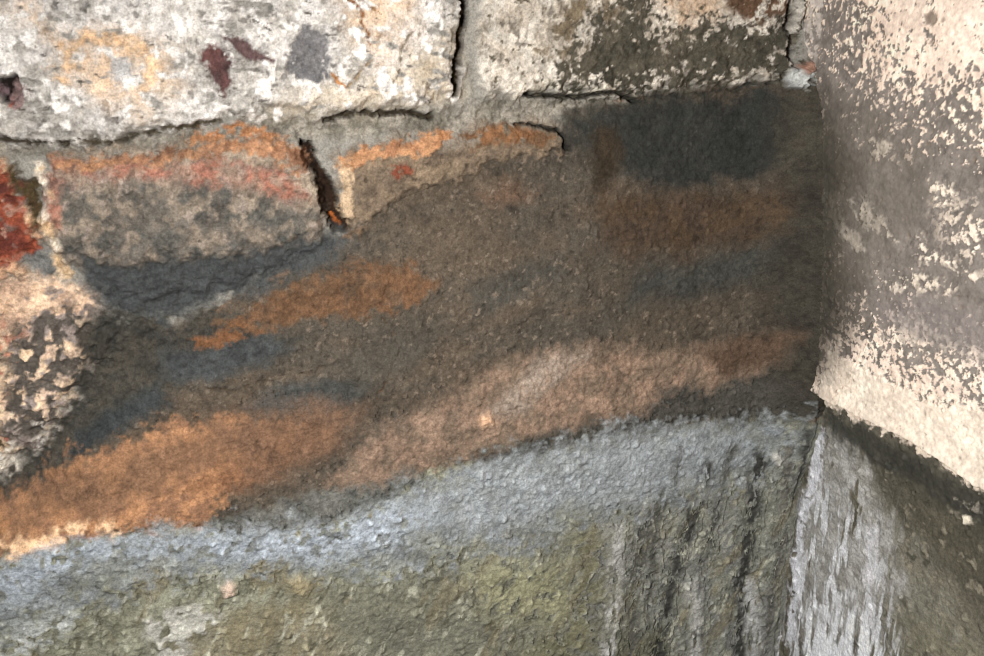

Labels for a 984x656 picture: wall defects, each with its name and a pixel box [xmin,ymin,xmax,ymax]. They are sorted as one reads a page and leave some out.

spalling [0,436,21,471]
crack [0,117,230,148]
spalling [0,153,317,272]
damp [0,168,442,488]
crack [298,0,469,231]
damp [0,400,819,656]
damp [517,0,803,197]
damp [618,48,984,656]